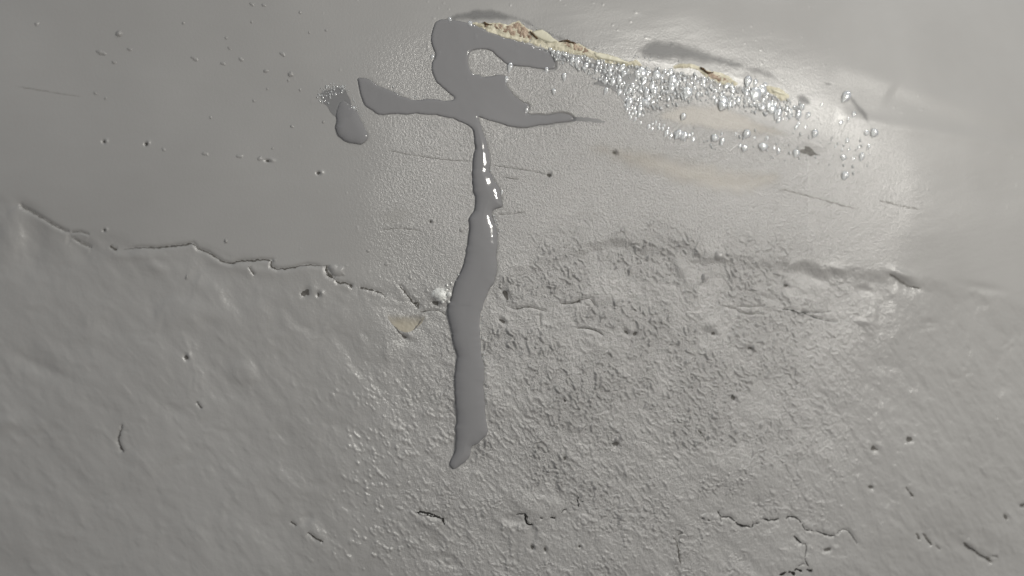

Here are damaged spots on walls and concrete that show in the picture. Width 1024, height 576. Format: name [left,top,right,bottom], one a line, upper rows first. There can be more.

spalling [473,21,642,67]
water stain [321,88,368,145]
water stain [431,288,448,301]
crack [702,511,857,576]